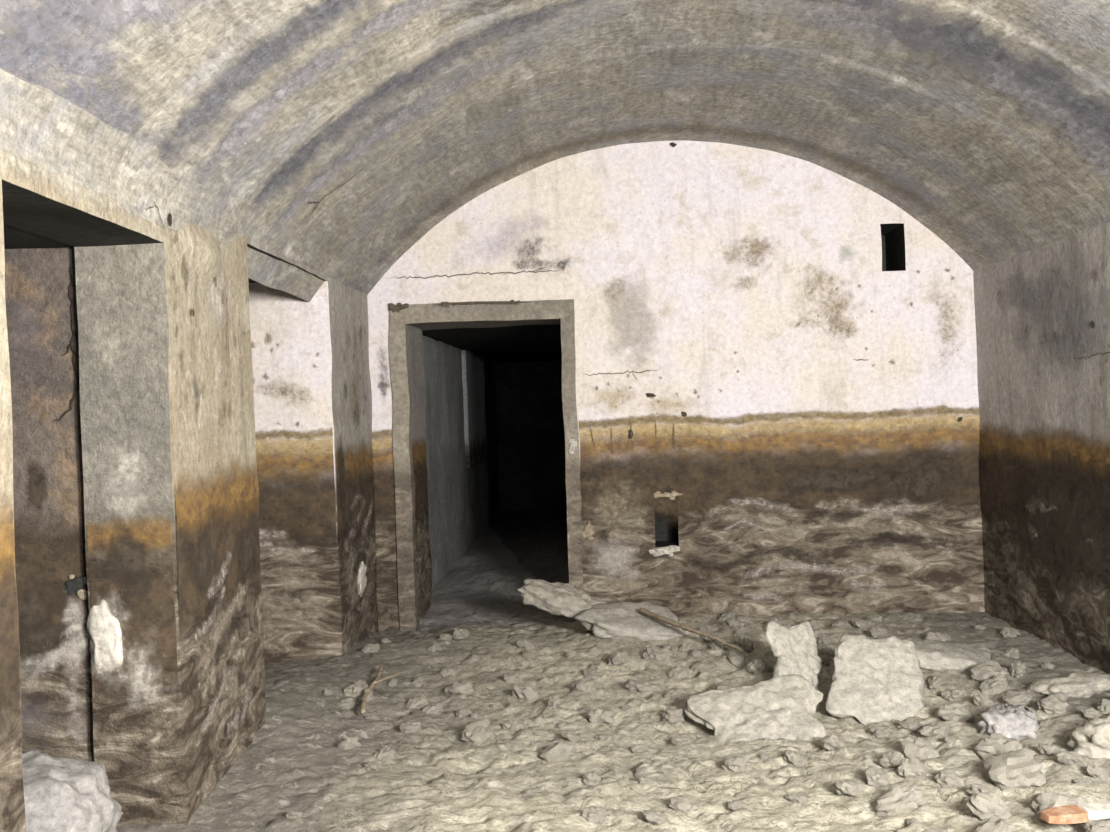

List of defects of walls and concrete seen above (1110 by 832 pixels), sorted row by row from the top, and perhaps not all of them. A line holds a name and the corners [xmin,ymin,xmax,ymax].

water stain [823,291,850,332]
water stain [412,442,429,521]